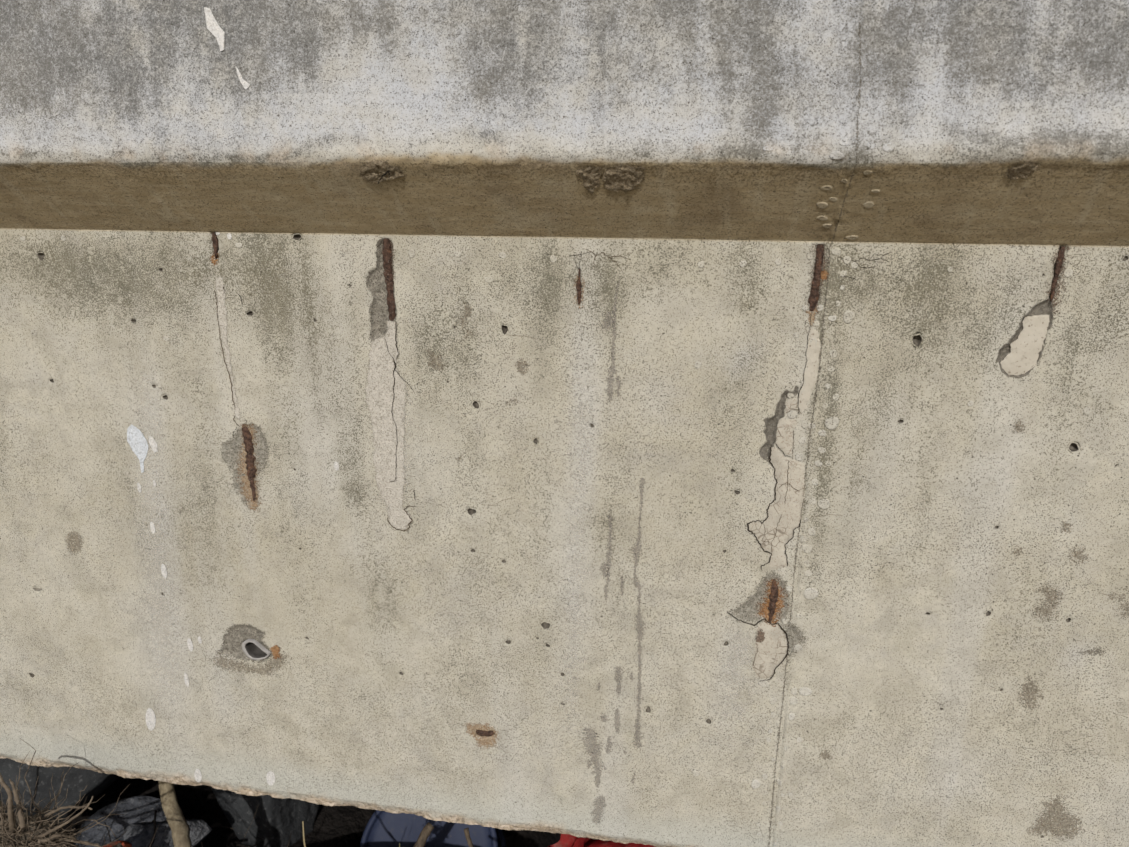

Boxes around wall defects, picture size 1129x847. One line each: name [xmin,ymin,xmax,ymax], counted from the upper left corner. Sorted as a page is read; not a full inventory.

crack [214,276,242,427]
spalling [364,238,415,531]
corrosion [574,269,585,308]
corrosion [805,242,829,325]
spalling [996,245,1070,378]
spalling [727,386,809,681]
spalling [211,651,294,676]
corrosion [463,723,499,747]